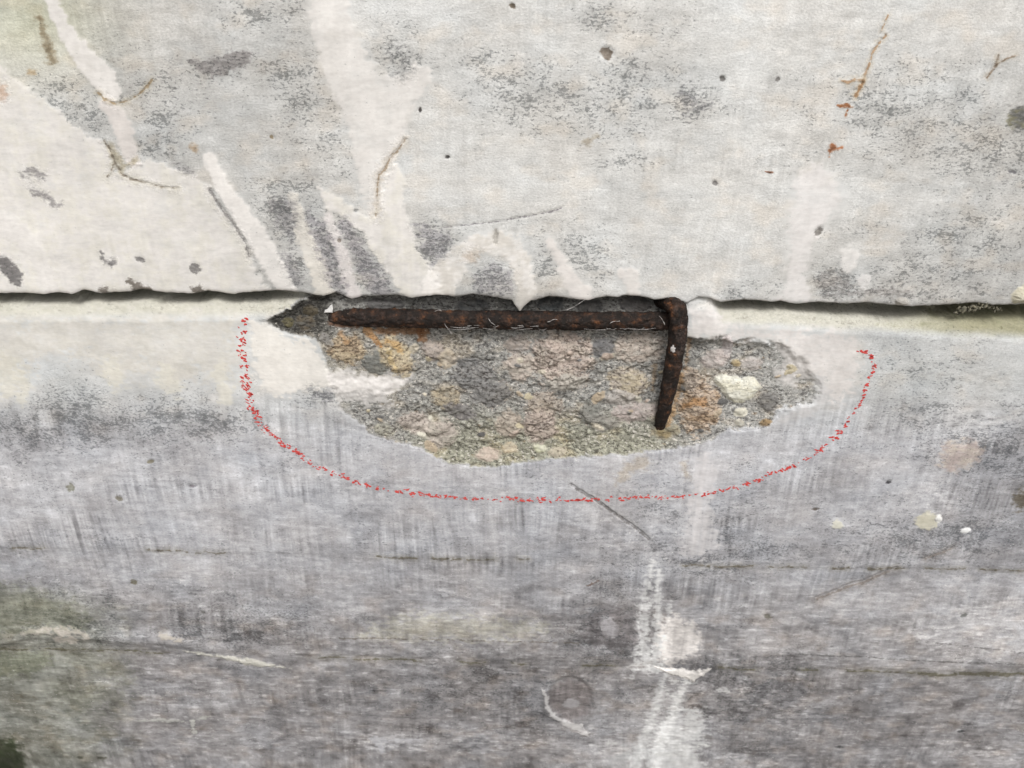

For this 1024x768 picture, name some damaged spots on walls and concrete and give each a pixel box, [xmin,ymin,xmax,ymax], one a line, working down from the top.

leakage [662,75,723,126]
rust [834,101,855,118]
leakage [1000,95,1024,141]
leakage [0,0,596,311]
rust [826,140,845,159]
leakage [771,159,926,306]
leakage [615,264,643,296]
rust [325,319,433,376]
leakage [300,363,416,413]
spalling [267,292,815,468]
rust [653,337,713,441]
leakage [344,554,725,768]